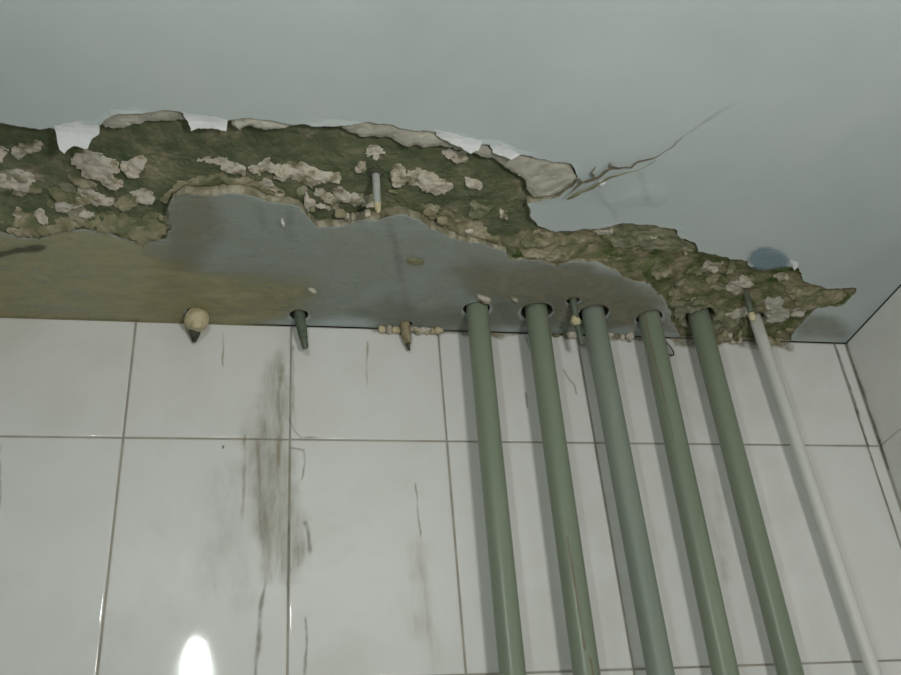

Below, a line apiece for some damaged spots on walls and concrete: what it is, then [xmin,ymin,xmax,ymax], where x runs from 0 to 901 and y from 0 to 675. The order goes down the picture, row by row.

spalling [0,110,856,341]
crack [564,139,681,200]